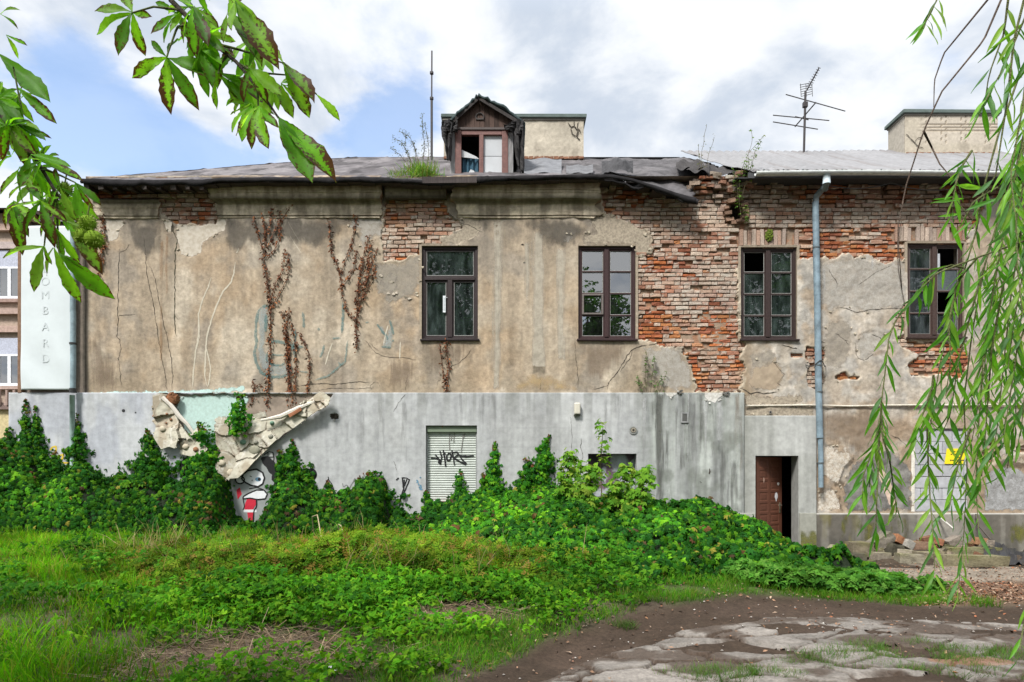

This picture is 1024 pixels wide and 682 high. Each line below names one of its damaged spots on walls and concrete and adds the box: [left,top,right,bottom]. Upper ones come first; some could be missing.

crack [116,225,179,388]
flaking render [95,183,226,257]
flaking render [347,200,481,302]
flaking render [583,170,1019,416]
peeling [92,386,248,445]
crack [575,343,666,389]
damp [643,393,667,500]